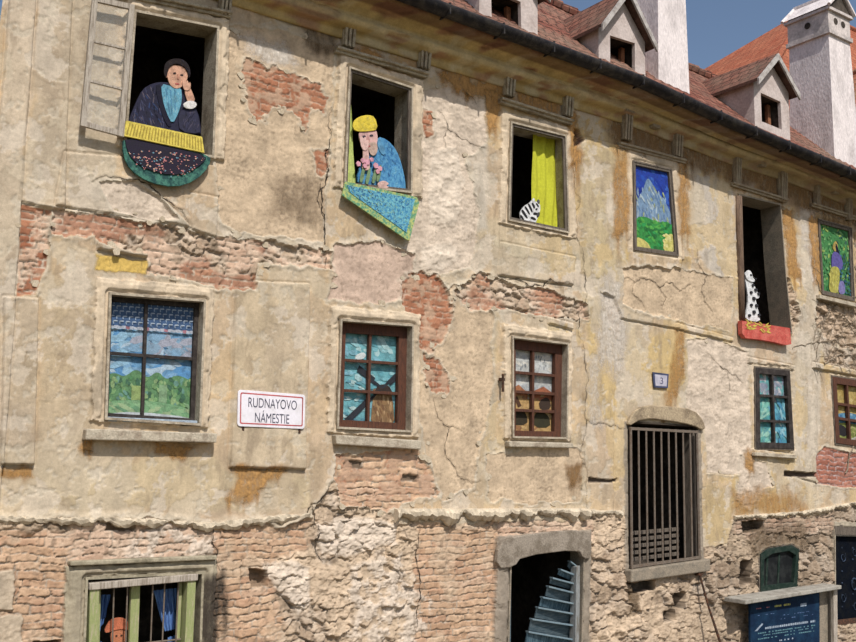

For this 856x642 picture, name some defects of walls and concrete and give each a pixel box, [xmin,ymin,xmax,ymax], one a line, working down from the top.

water stain [611,121,672,155]
crack [317,109,333,268]
water stain [682,147,856,226]
flaking render [15,22,619,517]
crack [625,250,710,308]
flaking render [601,264,856,534]
spalling [248,567,269,587]
crack [414,521,422,627]
spalling [628,579,656,593]
spalling [663,592,687,622]